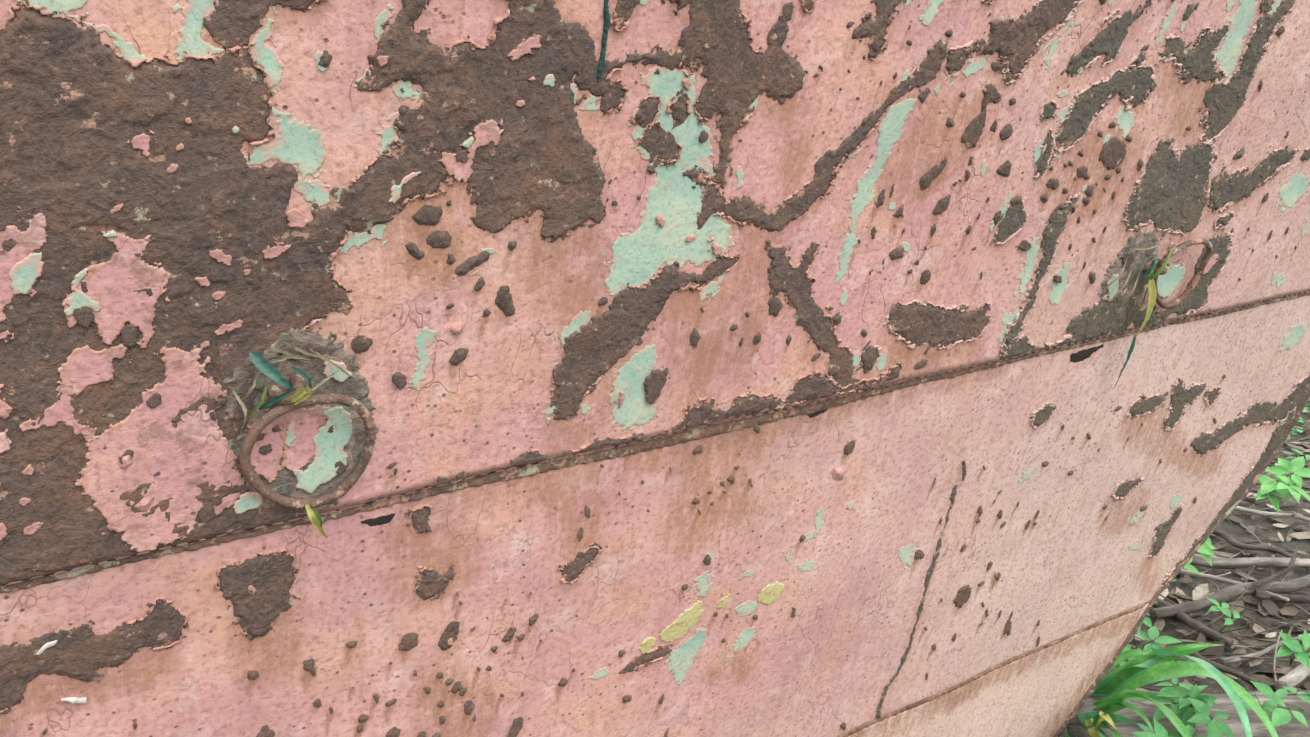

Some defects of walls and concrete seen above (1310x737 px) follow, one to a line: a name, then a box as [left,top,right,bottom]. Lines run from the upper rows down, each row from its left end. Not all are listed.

peeling [1211,0,1283,82]
peeling [598,65,735,306]
peeling [834,83,1023,306]
spalling [1040,104,1144,243]
spalling [405,200,517,317]
rust [0,0,1310,585]
peeling [323,335,373,383]
peeling [392,327,468,391]
peeling [609,343,669,432]
peeling [293,406,353,494]
rust [397,503,458,601]
crack [876,460,967,719]